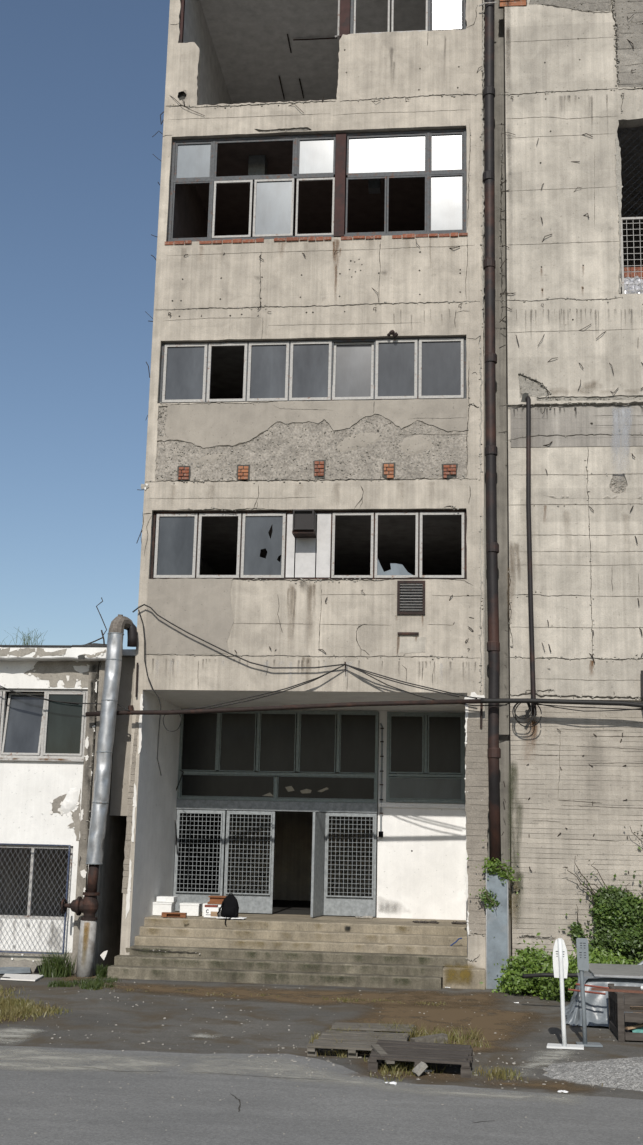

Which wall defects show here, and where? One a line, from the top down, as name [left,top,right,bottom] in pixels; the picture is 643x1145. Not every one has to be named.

spalling [529,0,643,88]
spalling [141,406,468,490]
peeling [0,647,106,693]
peeling [50,789,84,841]